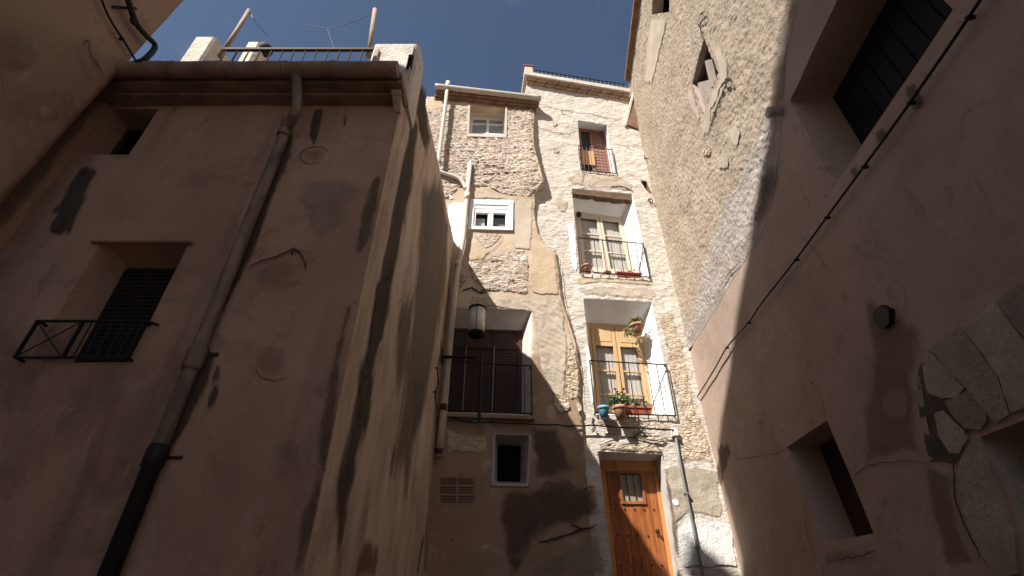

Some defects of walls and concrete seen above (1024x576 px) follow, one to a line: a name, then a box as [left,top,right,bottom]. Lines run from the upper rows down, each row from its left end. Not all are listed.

damp [310,109,322,143]
damp [51,167,95,234]
damp [223,134,292,309]
crack [249,248,307,270]
spalling [448,195,558,294]
damp [337,87,448,551]
damp [320,307,350,463]
spalling [918,361,968,463]
damp [297,492,319,565]